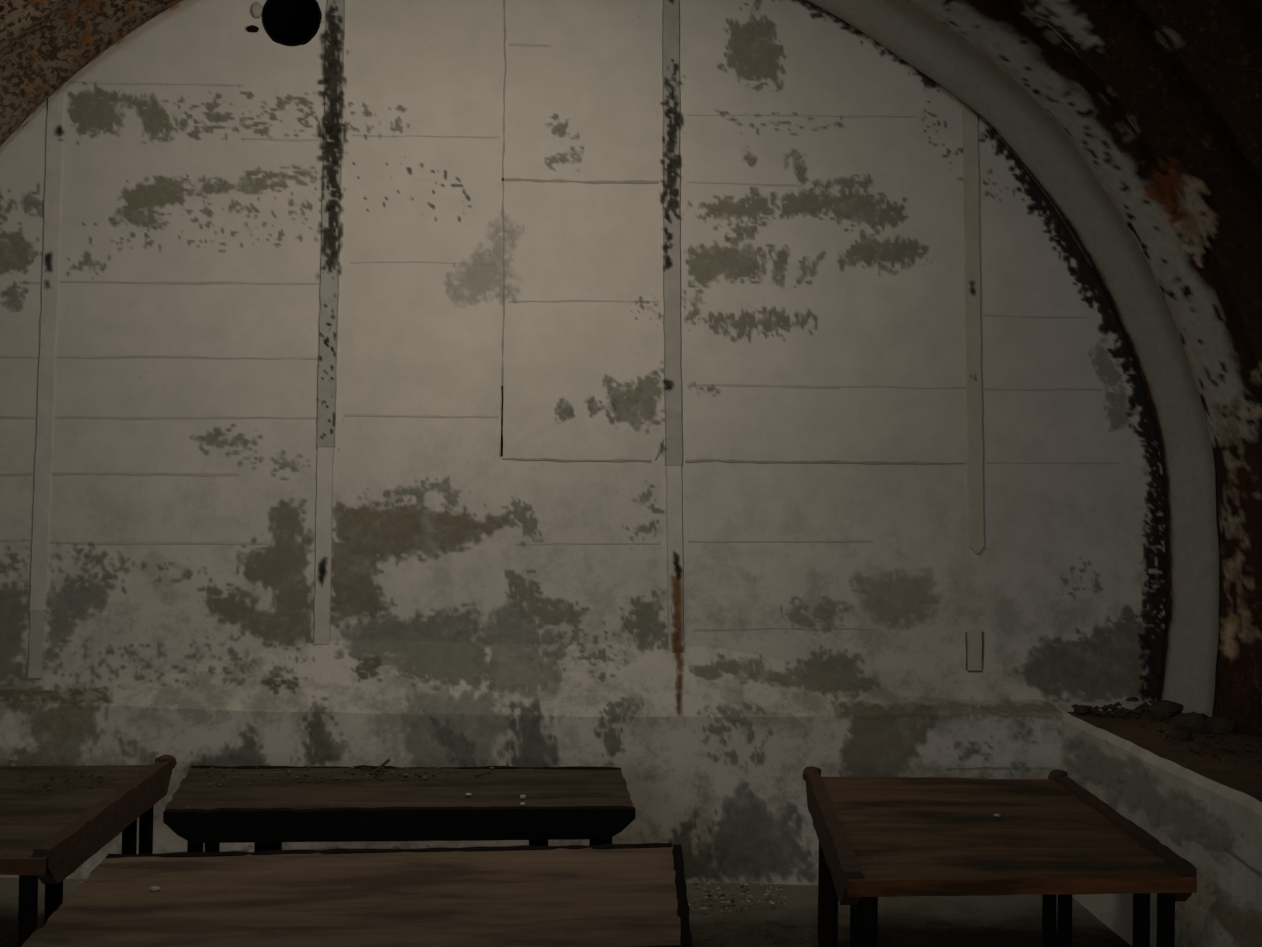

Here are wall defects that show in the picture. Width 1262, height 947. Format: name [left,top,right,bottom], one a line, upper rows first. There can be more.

peeling [68,84,320,141]
peeling [68,166,321,274]
leakage [318,6,347,273]
leakage [660,60,683,269]
peeling [718,0,785,89]
peeling [686,151,927,341]
rust [917,71,936,87]
spalling [979,128,1165,703]
leakage [0,580,114,766]
leakage [405,601,559,767]
rust [672,552,682,712]
leakage [834,606,1244,860]